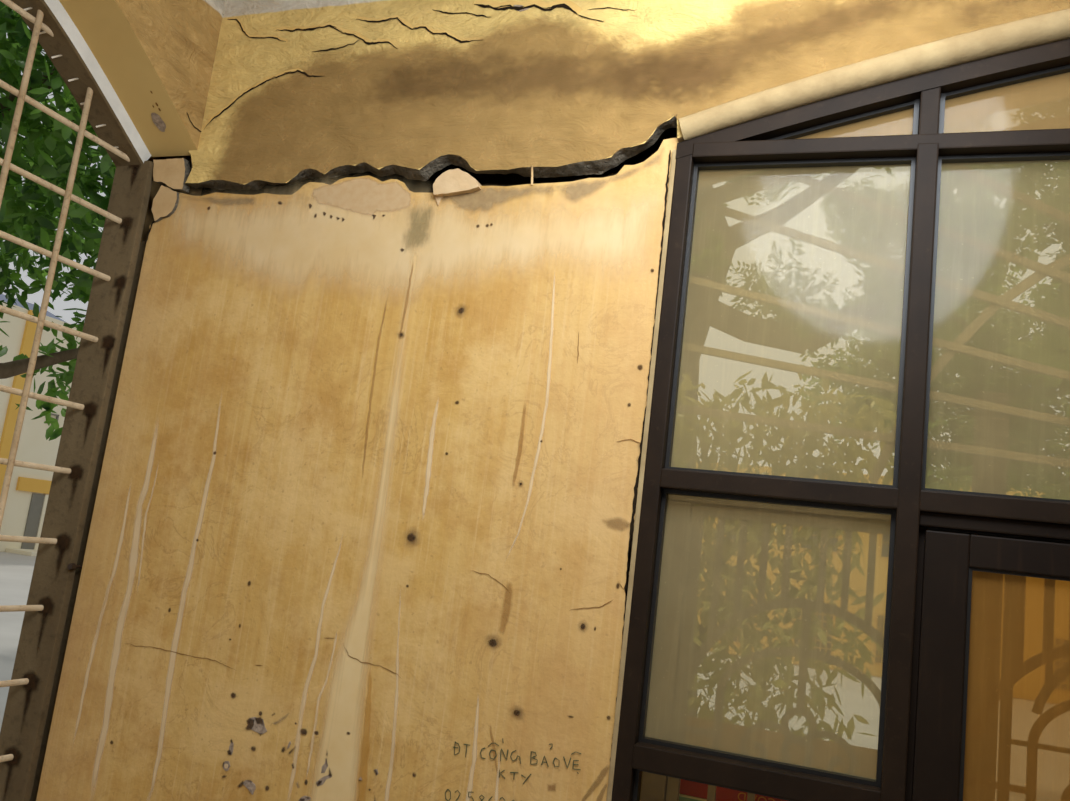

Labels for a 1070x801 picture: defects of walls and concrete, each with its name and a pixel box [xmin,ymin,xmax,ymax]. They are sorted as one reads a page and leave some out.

crack [187,0,630,132]
leakage [215,0,1070,184]
spalling [309,178,410,221]
leakage [564,182,603,199]
leakage [187,188,641,285]
peeling [246,713,285,736]
peeling [222,739,234,778]
peeling [316,754,332,786]